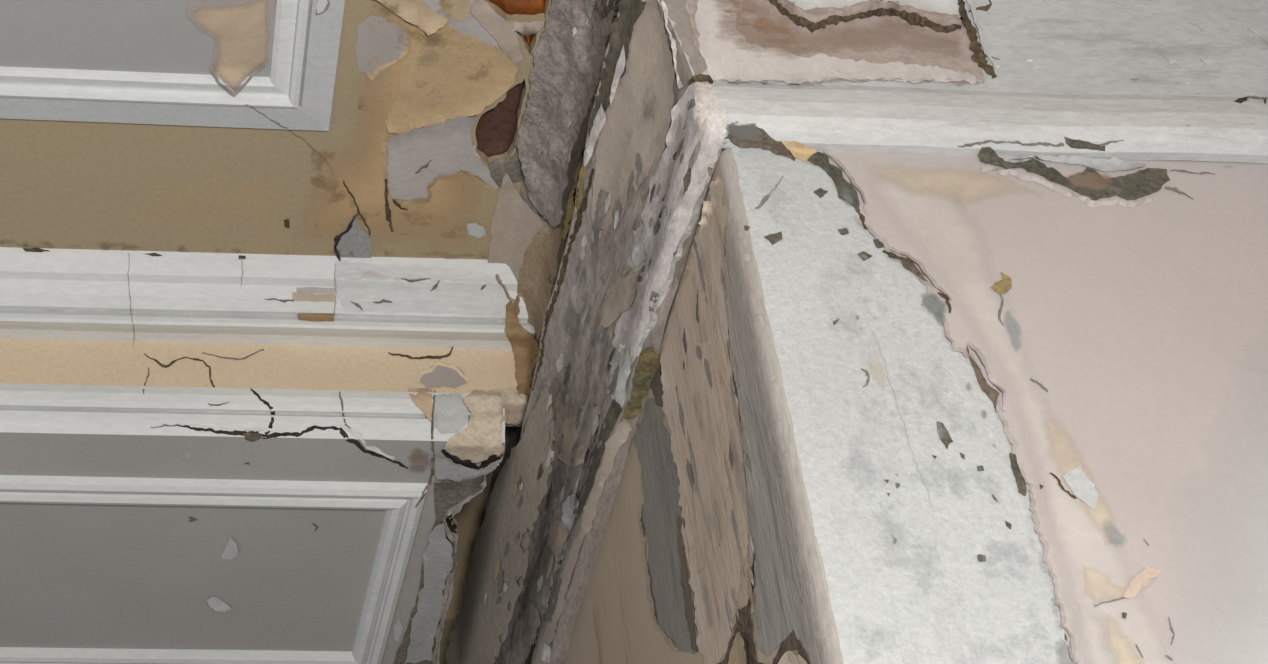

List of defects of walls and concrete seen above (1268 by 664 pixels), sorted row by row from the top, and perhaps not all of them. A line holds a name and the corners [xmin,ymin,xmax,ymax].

peeling [186,0,276,97]
flaking render [958,137,1214,208]
crack [127,253,440,507]
crack [388,347,453,359]
peeling [265,0,985,664]
flaking render [967,341,1007,411]
flaking render [991,272,1019,347]
flaking render [1010,453,1044,496]